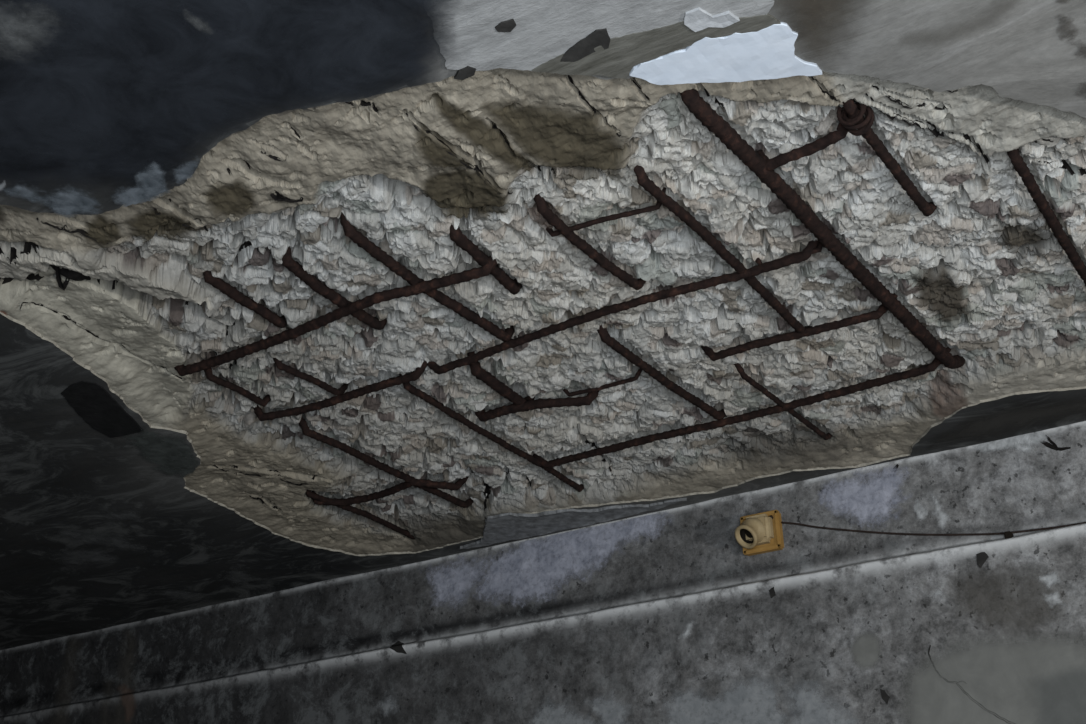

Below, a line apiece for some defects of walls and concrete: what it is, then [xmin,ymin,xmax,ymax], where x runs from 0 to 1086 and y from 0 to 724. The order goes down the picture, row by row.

rust [206,183,254,215]
rust [1002,224,1044,255]
spalling [0,0,1086,556]
rust [917,264,968,321]